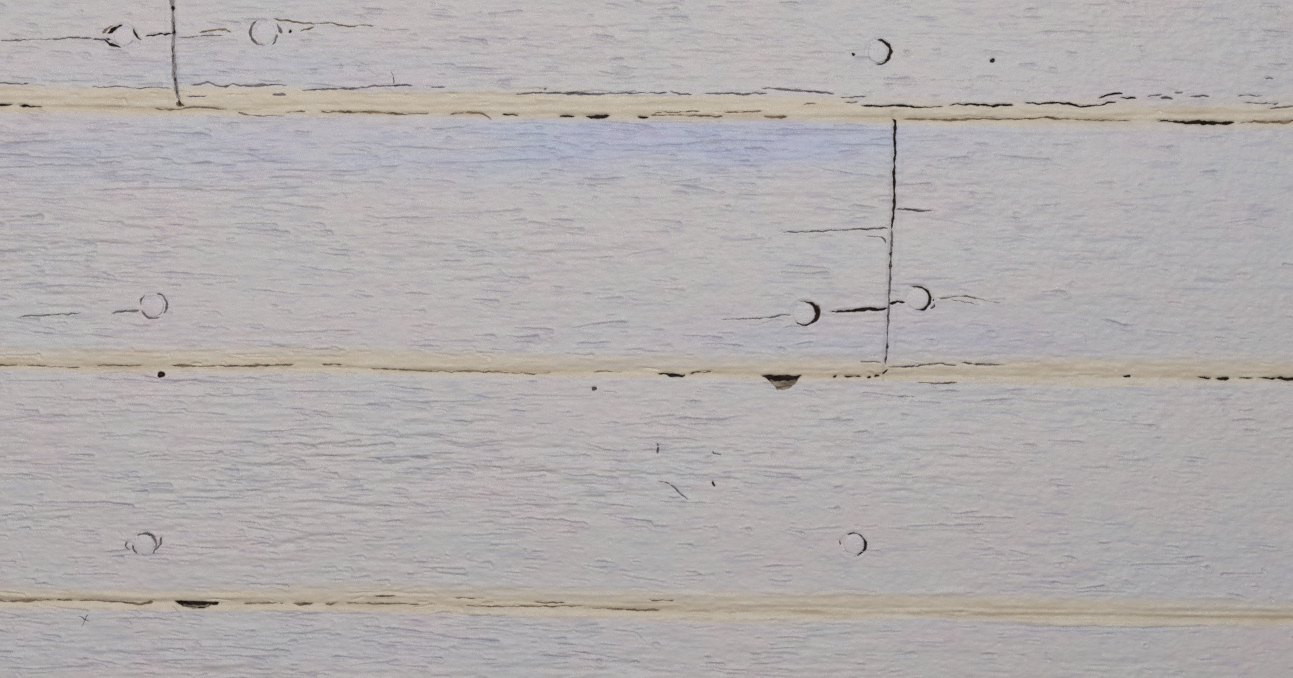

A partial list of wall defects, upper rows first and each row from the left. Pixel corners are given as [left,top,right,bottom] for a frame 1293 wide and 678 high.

peeling [761,375,801,390]